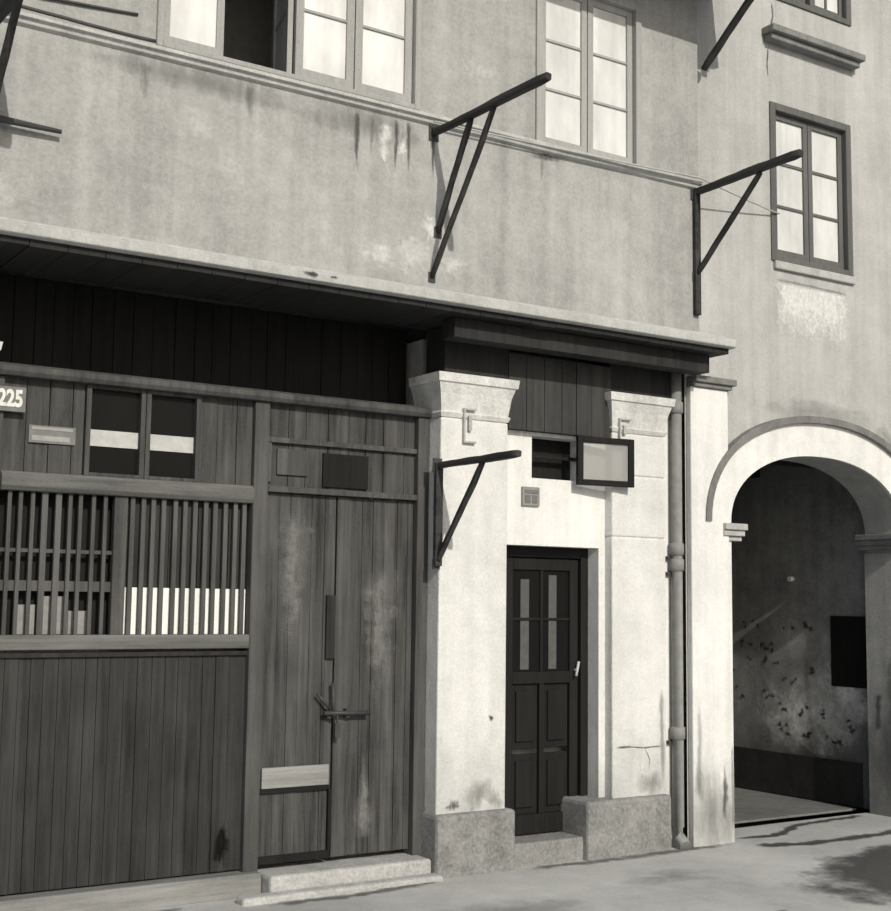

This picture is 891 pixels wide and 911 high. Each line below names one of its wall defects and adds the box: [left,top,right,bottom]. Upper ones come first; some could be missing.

water stain [395,123,410,158]